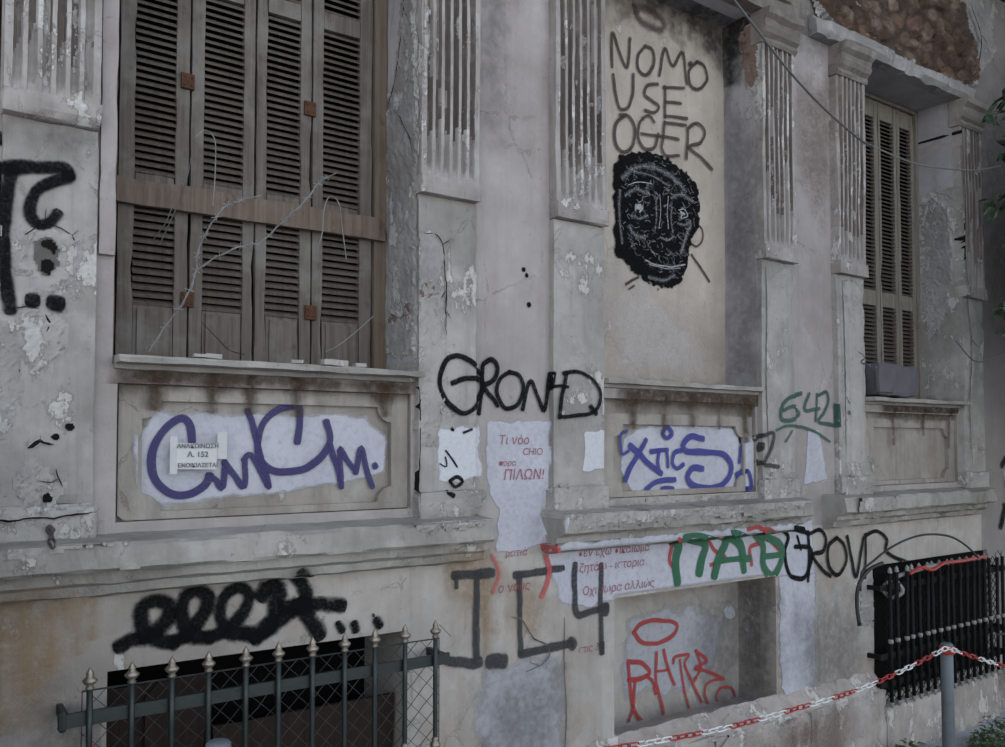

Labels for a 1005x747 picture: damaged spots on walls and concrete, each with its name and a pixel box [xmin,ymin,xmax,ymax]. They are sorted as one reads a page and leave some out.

peeling [960,0,1005,75]
spalling [0,224,83,411]
spalling [385,0,449,447]
peeling [919,185,976,487]